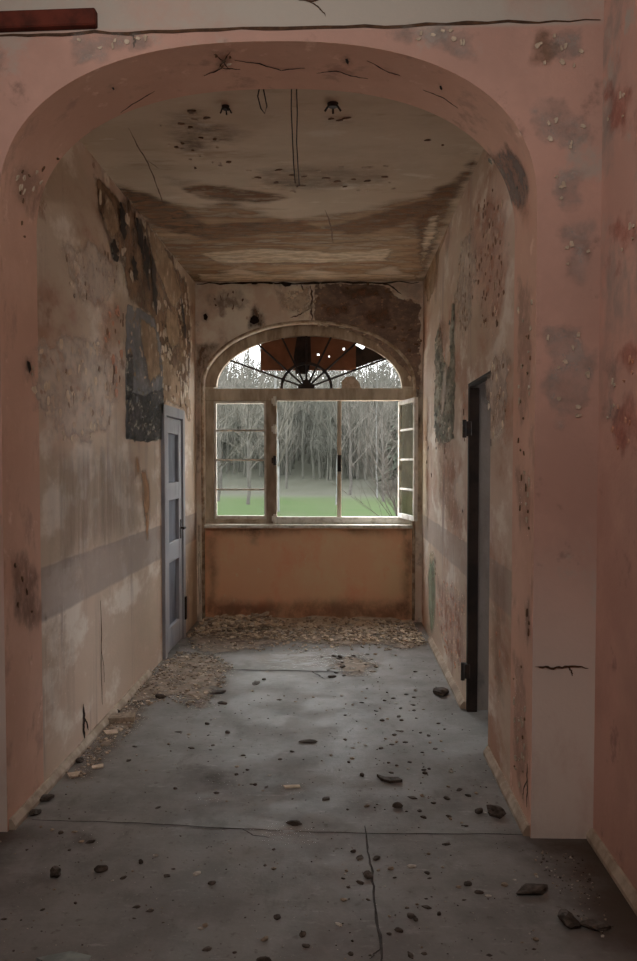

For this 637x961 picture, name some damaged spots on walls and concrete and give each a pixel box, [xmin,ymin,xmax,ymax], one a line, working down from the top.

crack [0,0,601,48]
crack [206,60,400,79]
leakage [123,162,476,300]
spalling [96,179,192,442]
spalling [246,308,265,327]
spalling [312,282,422,390]
spalling [434,304,465,455]
peeling [486,351,531,445]
crack [537,665,588,676]
crack [32,819,307,838]
crack [338,828,447,961]